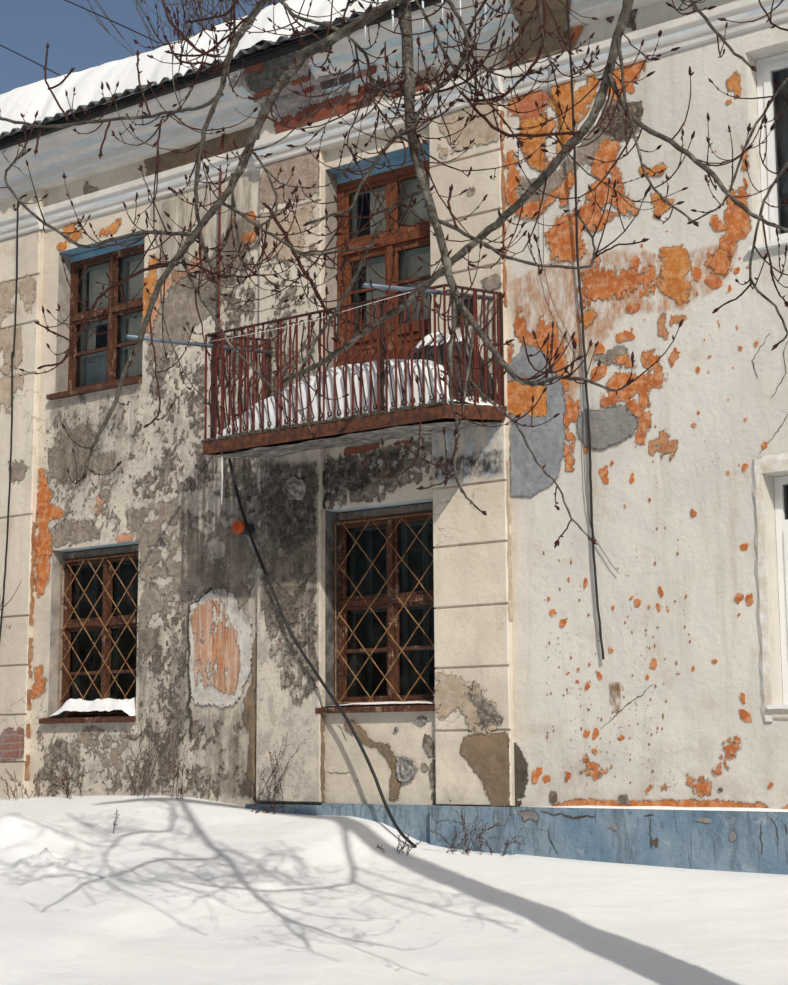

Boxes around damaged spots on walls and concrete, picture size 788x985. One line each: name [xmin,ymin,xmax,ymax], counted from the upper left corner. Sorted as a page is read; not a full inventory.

flaking render [242,50,403,134]
peeling [437,60,752,472]
peeling [0,274,37,414]
peeling [599,460,614,484]
peeling [31,664,47,699]
flaking render [35,394,320,701]
flaking render [433,670,769,823]
peeling [544,597,680,785]
peeling [620,586,688,645]